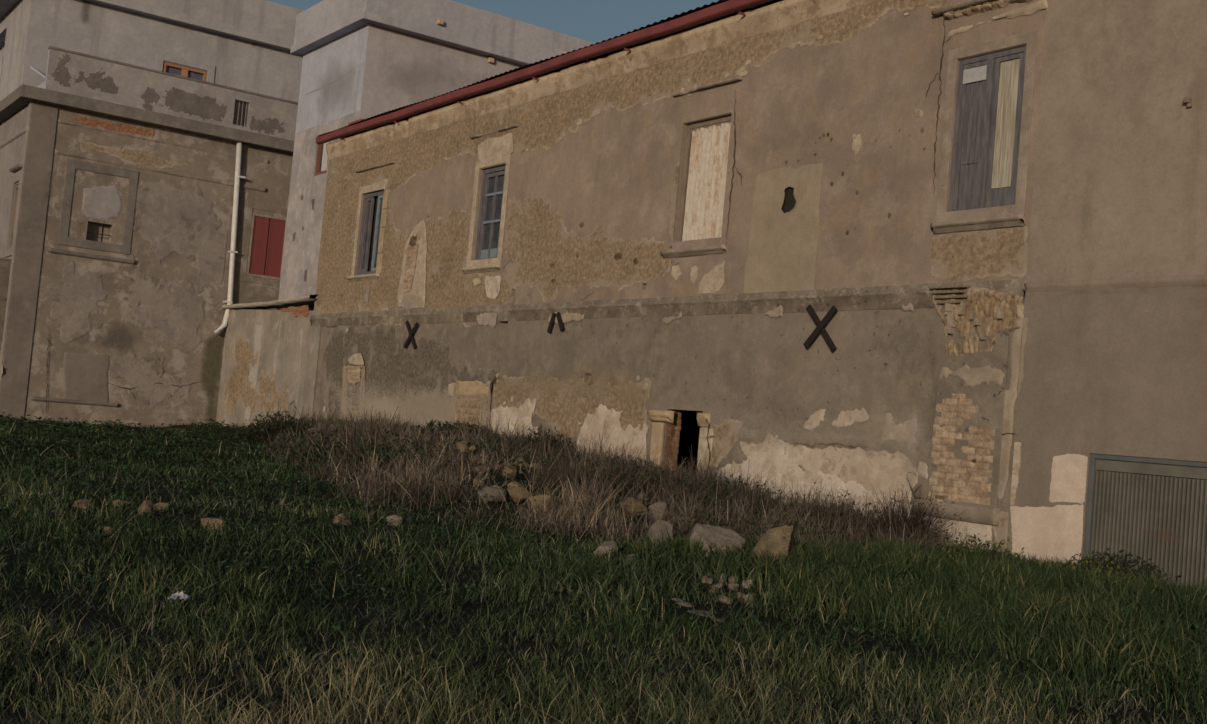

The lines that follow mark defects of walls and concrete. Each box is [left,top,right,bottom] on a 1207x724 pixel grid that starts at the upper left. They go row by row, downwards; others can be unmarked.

peeling [51,53,118,94]
peeling [249,116,285,135]
crack [926,15,952,196]
flaking render [280,0,1043,445]
peeling [577,404,648,471]
flaking render [711,324,1022,553]